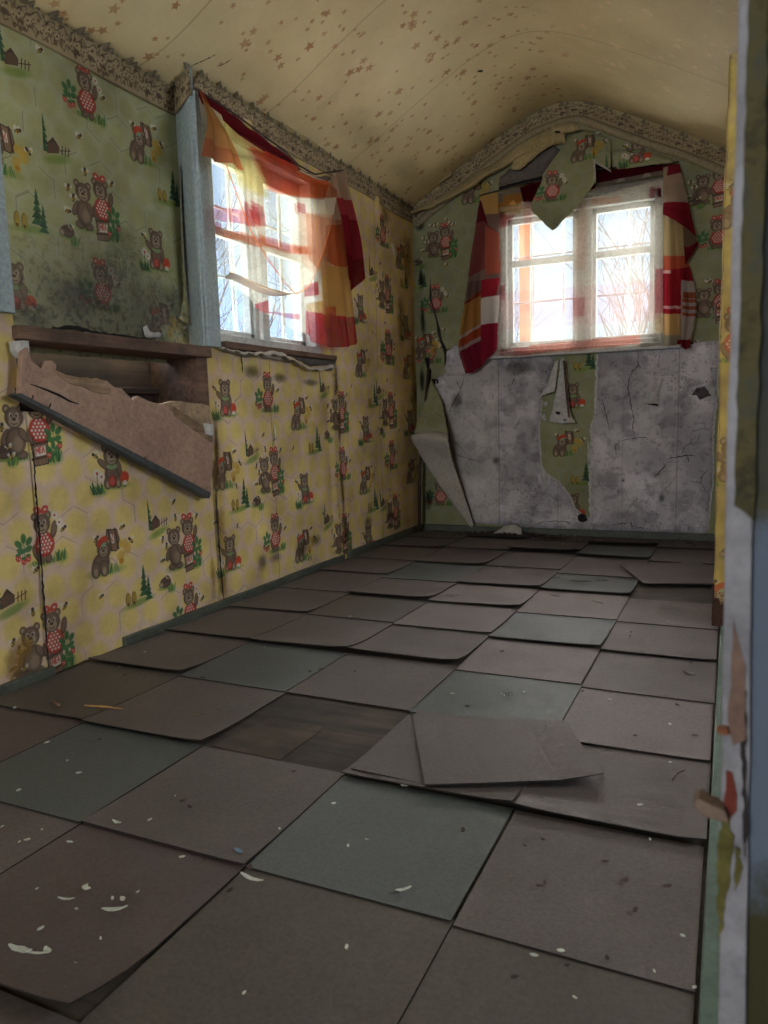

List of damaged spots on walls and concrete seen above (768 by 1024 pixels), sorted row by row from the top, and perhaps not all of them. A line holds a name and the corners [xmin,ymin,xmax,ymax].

peeling [499,145,560,186]
spalling [16,353,214,439]
peeling [435,341,719,534]
crack [603,351,650,454]
crack [615,429,706,529]
crack [32,435,49,668]
peeling [727,621,746,745]
peeling [723,770,737,819]